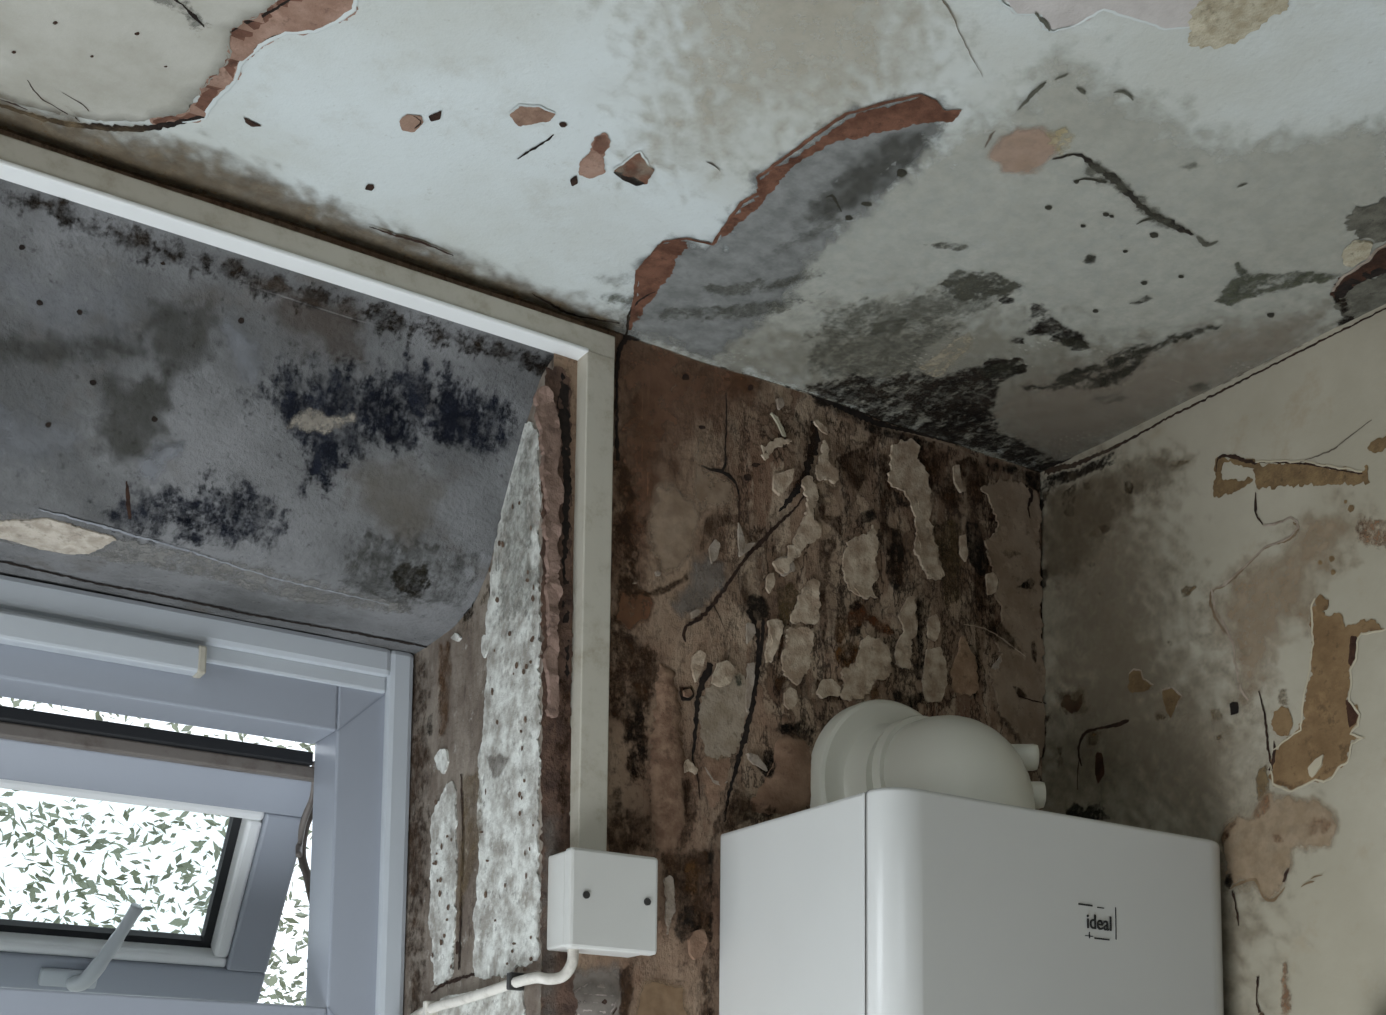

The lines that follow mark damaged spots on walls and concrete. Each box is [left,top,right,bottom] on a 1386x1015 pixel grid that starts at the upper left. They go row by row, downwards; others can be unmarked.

crack [154,0,204,27]
leakage [89,379,288,547]
flaking render [149,0,358,125]
leakage [11,194,550,495]
leakage [0,99,631,331]
leakage [405,642,475,1014]
peeling [428,366,688,1015]
spalling [570,133,654,186]
flaking render [623,94,961,358]
peeling [690,398,1087,808]
leakage [696,61,1386,825]
peeling [1221,594,1386,926]